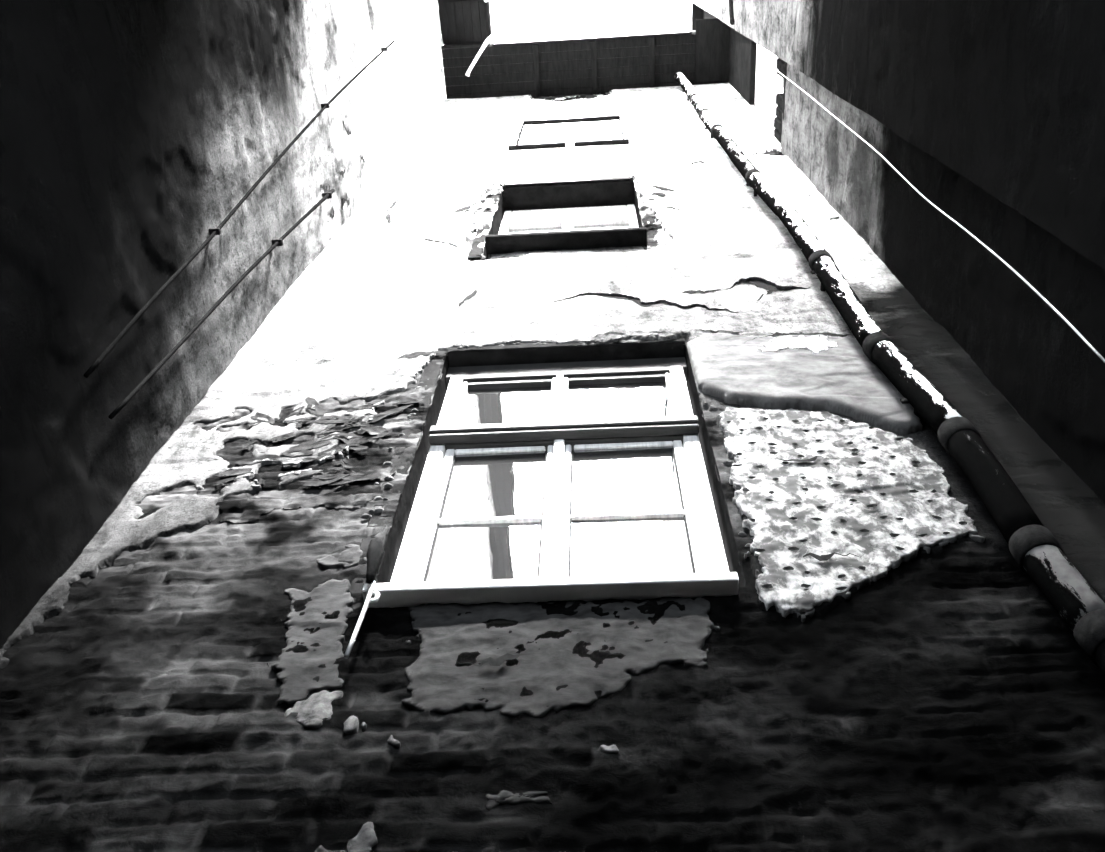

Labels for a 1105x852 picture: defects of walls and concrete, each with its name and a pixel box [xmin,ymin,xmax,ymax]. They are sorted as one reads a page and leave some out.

flaking render [459,182,506,262]
flaking render [630,175,675,250]
crack [552,254,854,341]